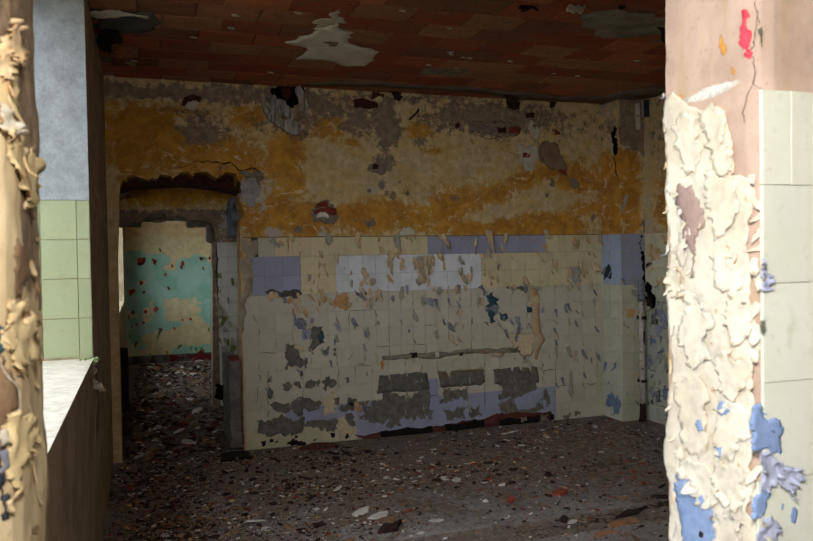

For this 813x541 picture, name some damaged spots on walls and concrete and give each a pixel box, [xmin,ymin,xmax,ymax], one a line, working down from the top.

peeling [580,9,666,38]
crack [742,0,761,123]
crack [180,160,259,171]
peeling [0,234,43,521]
peeling [166,344,211,362]
peeling [256,81,808,541]